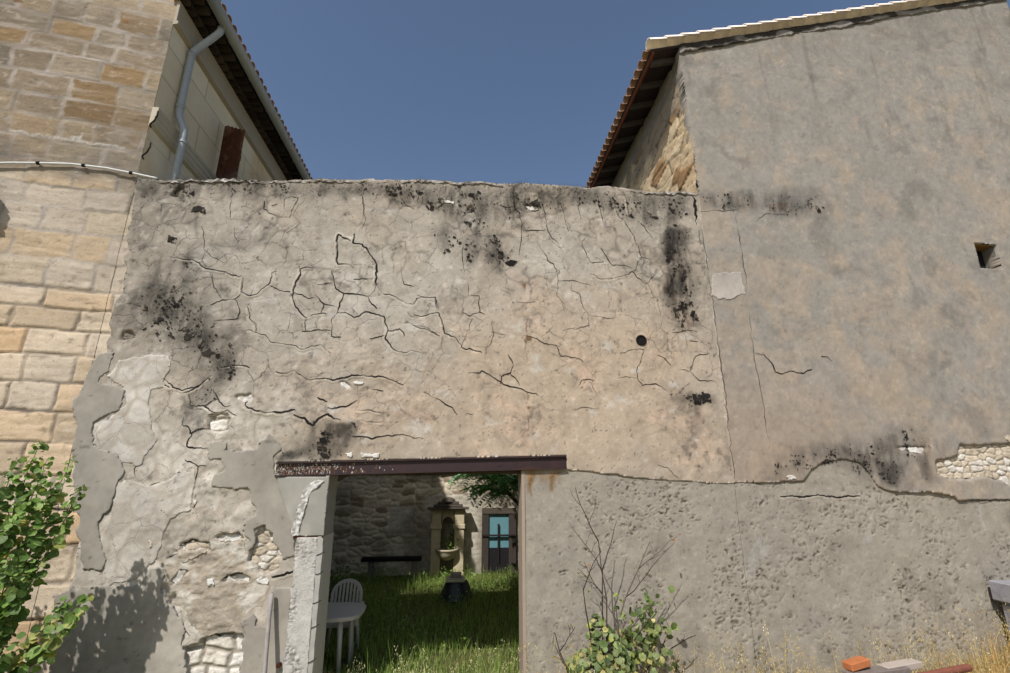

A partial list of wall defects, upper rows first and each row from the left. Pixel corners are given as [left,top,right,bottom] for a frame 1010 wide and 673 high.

leakage [210,178,699,331]
flaking render [93,354,171,467]
flaking render [123,304,164,339]
leakage [141,262,236,400]
flaking render [209,413,231,431]
crack [157,188,785,480]
crack [749,318,832,445]
crack [780,493,861,501]
leakage [775,429,931,487]
flaking render [935,435,1010,484]
flaking render [100,468,282,673]